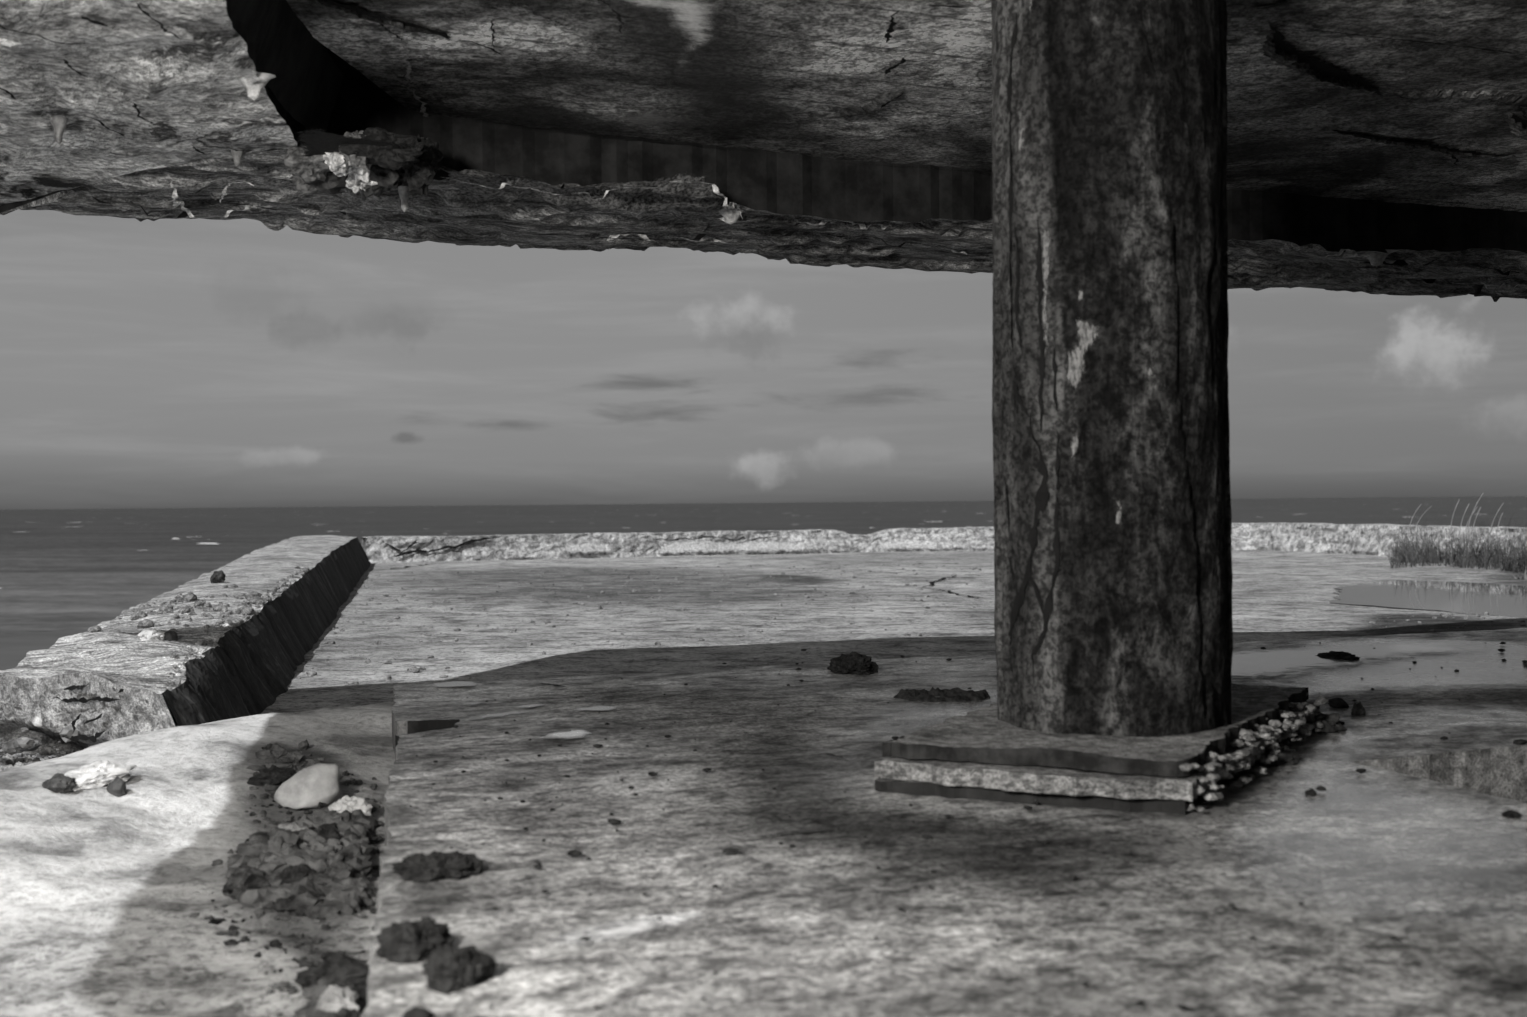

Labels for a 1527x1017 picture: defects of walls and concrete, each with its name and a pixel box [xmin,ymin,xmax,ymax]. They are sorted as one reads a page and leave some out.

crack [305,0,501,117]
crack [1253,0,1527,165]
spalling [0,176,86,201]
peeling [170,181,278,218]
spalling [284,127,743,219]